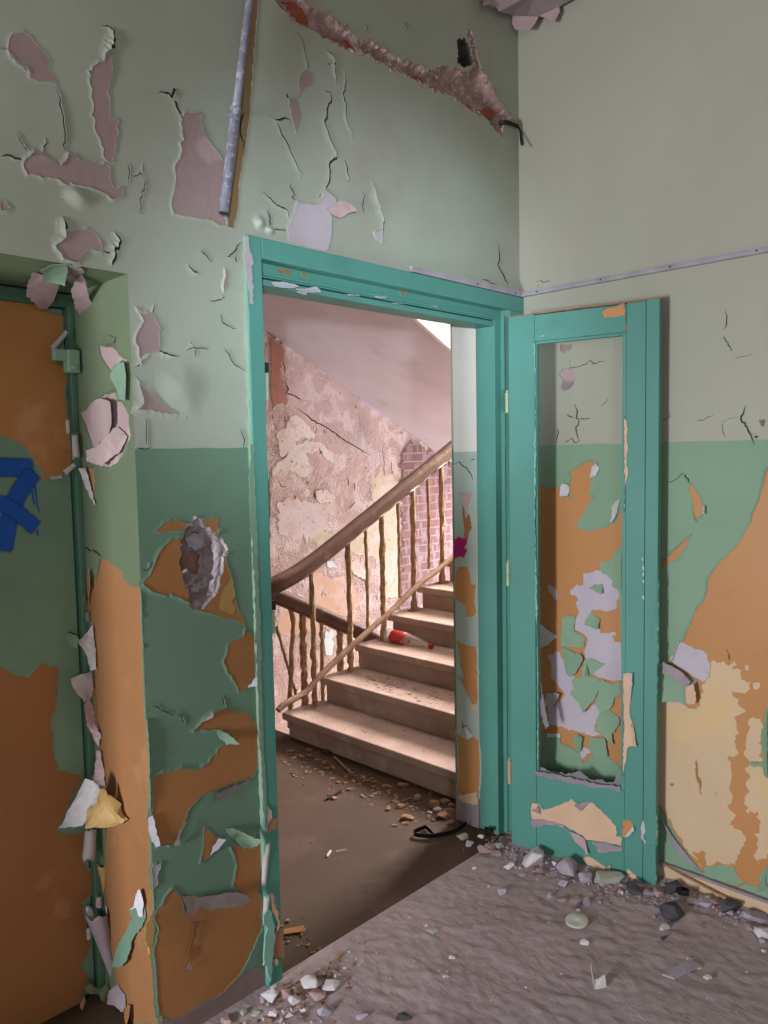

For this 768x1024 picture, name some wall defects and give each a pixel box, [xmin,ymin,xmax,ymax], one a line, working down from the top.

crack [158,88,182,129]
crack [261,31,385,242]
spalling [274,0,514,140]
crack [482,239,510,288]
peeling [0,0,336,1024]
crack [283,353,395,491]
peeling [308,461,478,622]
peeling [368,439,436,503]
crack [555,397,610,445]
peeling [533,333,638,782]
crack [662,405,759,446]
peeling [529,464,768,892]